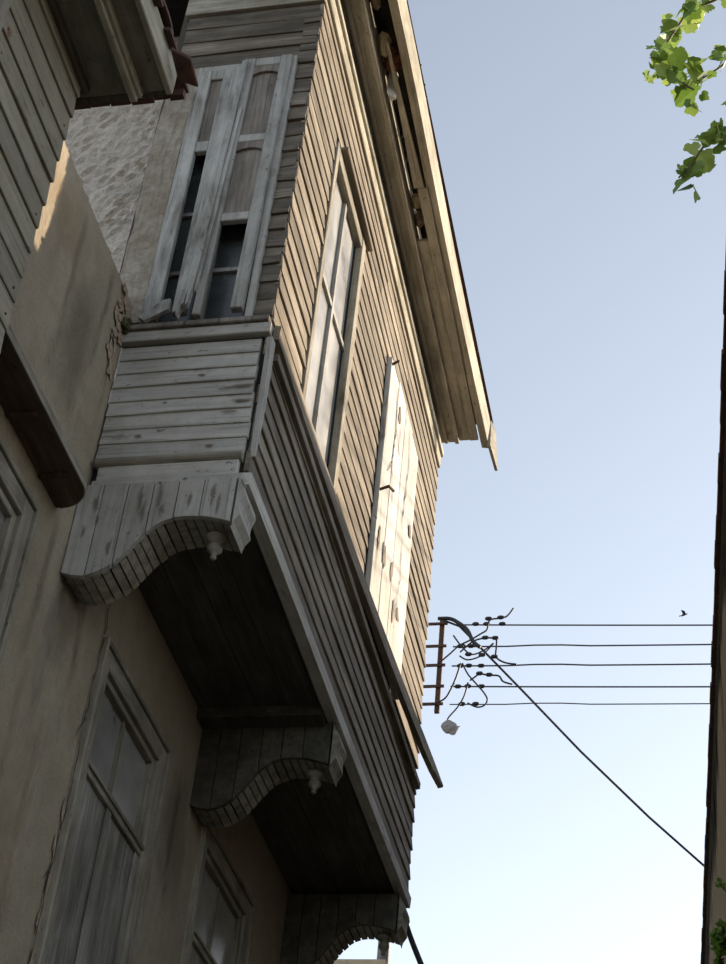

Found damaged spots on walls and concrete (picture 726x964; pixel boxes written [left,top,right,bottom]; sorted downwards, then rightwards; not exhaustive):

crack [28,604,111,964]